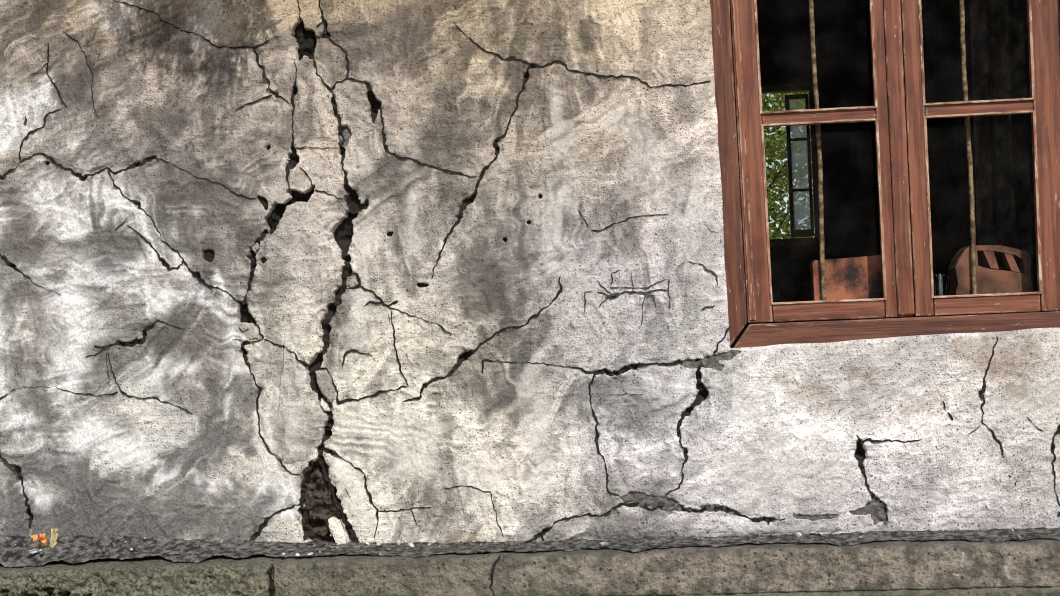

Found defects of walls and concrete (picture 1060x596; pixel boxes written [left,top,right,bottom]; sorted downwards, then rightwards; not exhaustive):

crack [0,0,922,545]
crack [444,485,504,596]
crack [943,337,1017,486]
crack [1027,417,1060,516]